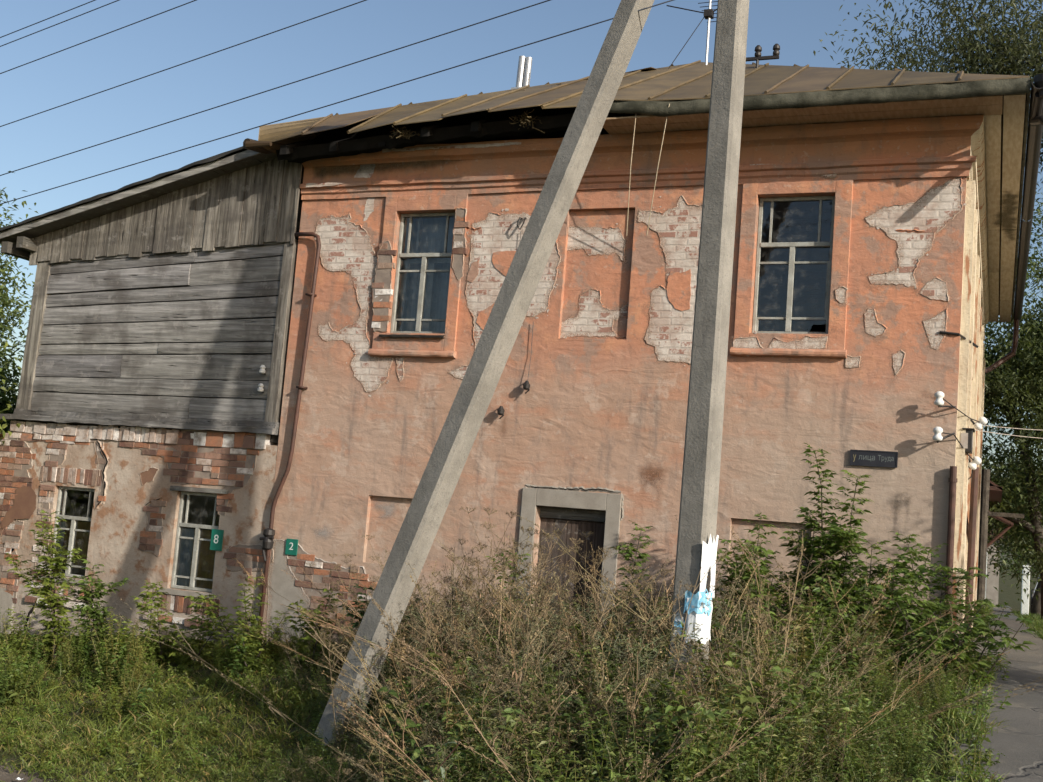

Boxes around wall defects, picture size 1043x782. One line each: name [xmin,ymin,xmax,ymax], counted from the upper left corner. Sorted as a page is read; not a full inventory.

flaking render [314,197,405,397]
flaking render [448,208,531,380]
flaking render [522,223,626,326]
flaking render [560,288,629,339]
flaking render [637,195,702,366]
flaking render [863,177,967,350]
spalling [0,433,110,604]
crack [96,439,109,509]
spalling [138,499,167,557]
spalling [119,429,259,516]